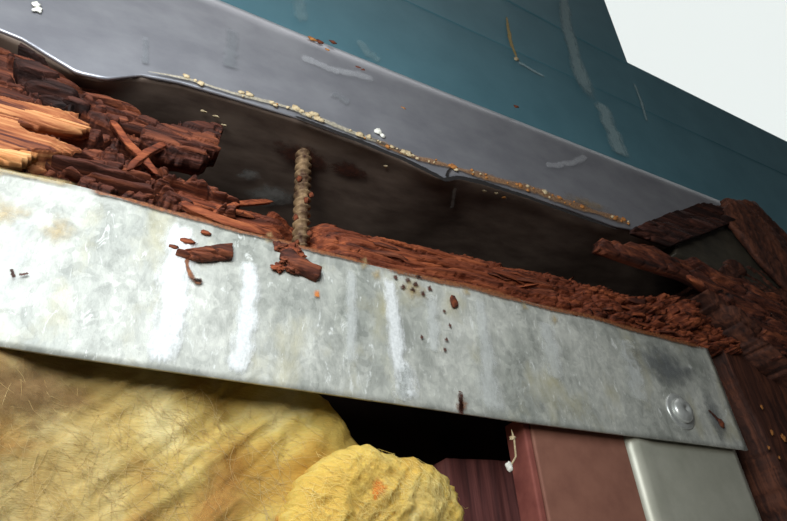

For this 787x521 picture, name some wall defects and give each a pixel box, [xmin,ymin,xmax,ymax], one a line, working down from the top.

rust [153,72,630,225]
damp [147,225,192,361]
rust [185,259,203,284]
rust [94,190,365,264]
damp [228,263,258,371]
damp [384,280,415,397]
rust [387,268,703,348]